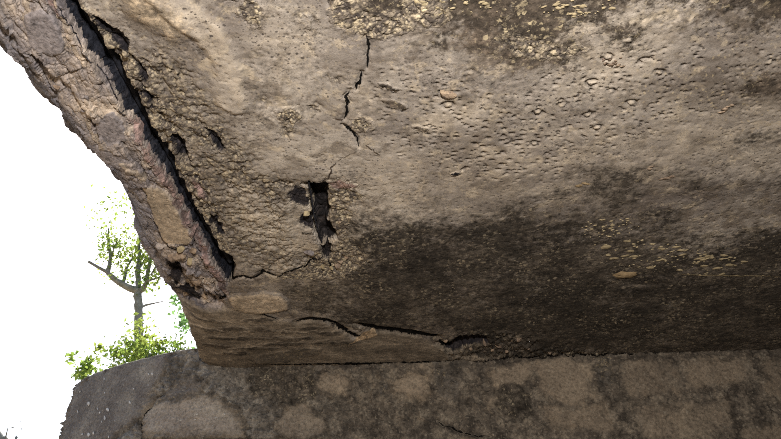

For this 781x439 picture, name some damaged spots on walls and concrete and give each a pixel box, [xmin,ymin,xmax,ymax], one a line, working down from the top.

water stain [263,0,781,92]
crack [322,25,380,182]
crack [215,252,334,299]
spalling [278,177,370,282]
water stain [187,54,781,416]
crack [252,314,659,387]